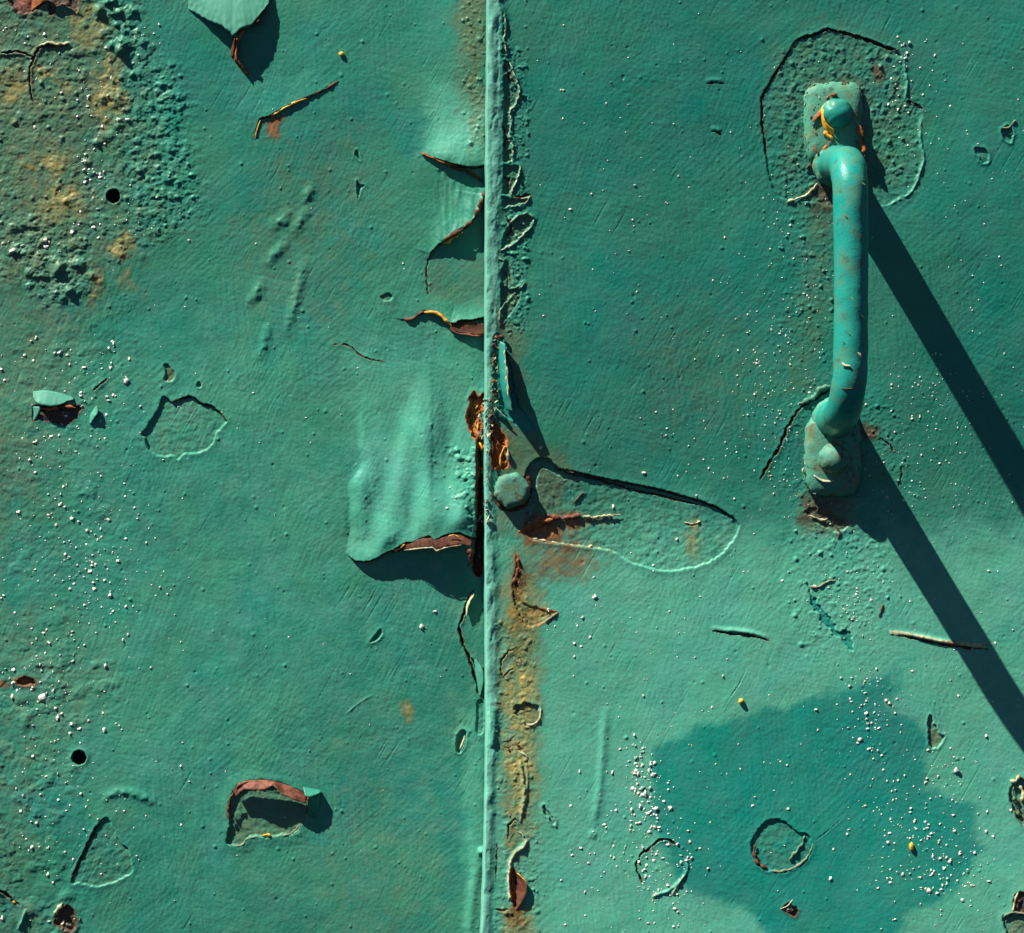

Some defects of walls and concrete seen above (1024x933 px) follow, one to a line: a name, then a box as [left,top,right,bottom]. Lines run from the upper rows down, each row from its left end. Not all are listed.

peeling [188,0,338,137]
corrosion [267,117,282,137]
peeling [759,27,925,211]
peeling [348,6,536,567]
peeling [32,390,99,426]
crack [760,362,853,480]
peeling [517,456,741,573]
corrosion [501,573,549,814]
peeling [69,816,135,889]
peeling [225,777,320,848]
peeling [749,817,814,875]
corrosion [505,903,529,933]